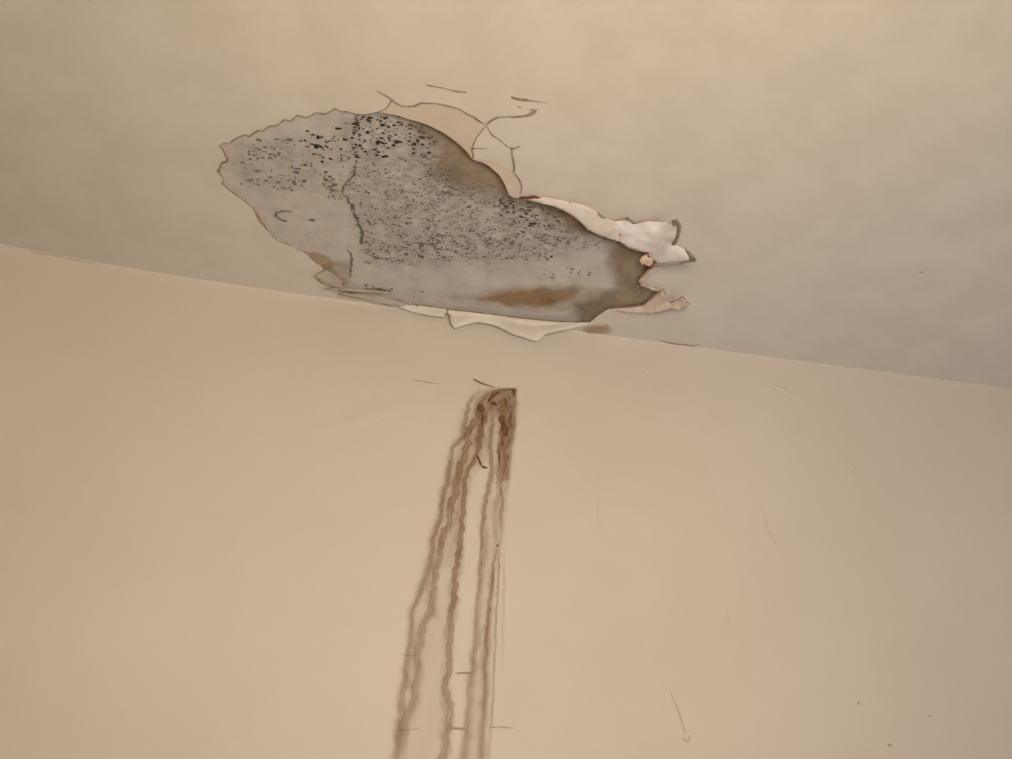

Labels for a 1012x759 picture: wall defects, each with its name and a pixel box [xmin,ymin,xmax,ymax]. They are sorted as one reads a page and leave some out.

leakage [240,115,657,322]
peeling [217,102,697,341]
crack [379,85,548,194]
leakage [456,390,516,529]